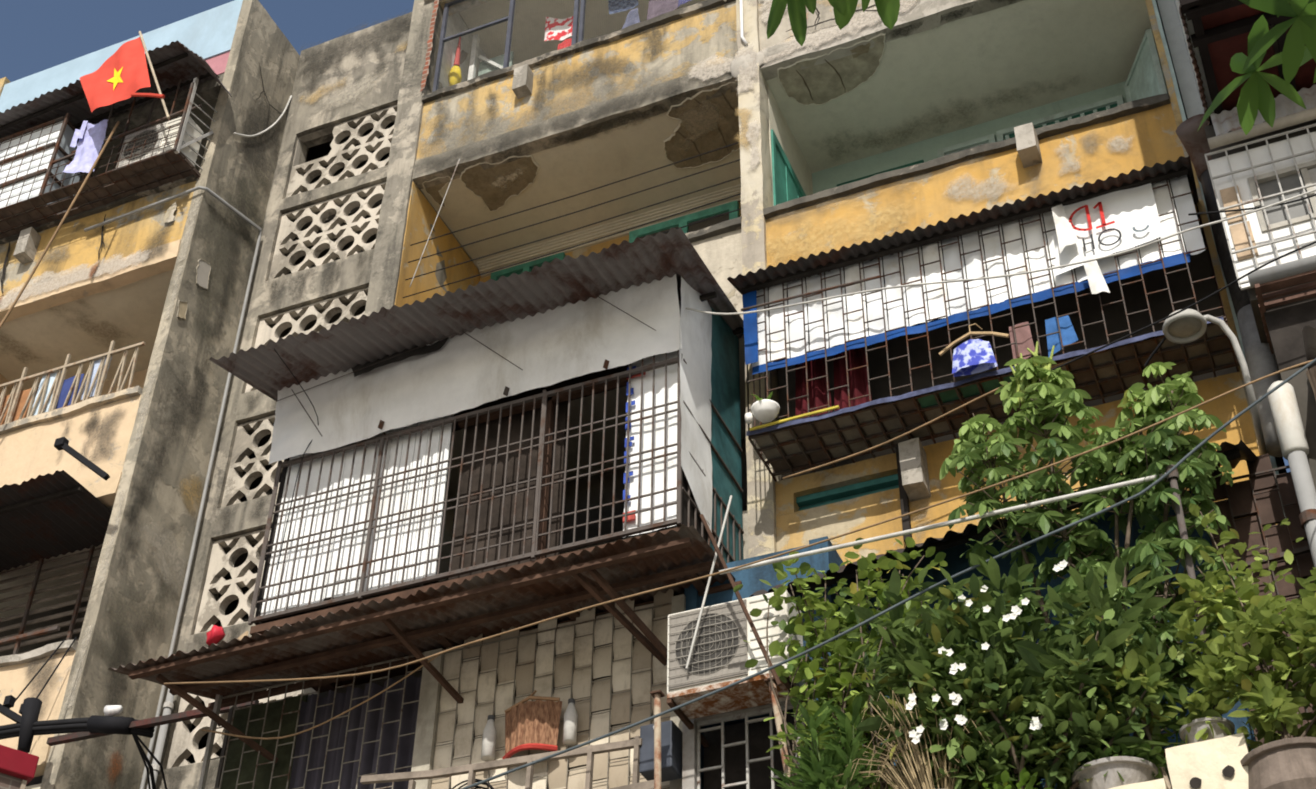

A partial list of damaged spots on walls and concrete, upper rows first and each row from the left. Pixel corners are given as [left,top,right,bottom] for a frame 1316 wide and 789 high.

peeling [899,0,916,12]
water stain [422,28,696,168]
flaking render [663,6,886,169]
water stain [198,100,280,336]
flaking render [422,155,540,212]
water stain [84,411,121,458]
water stain [105,359,209,705]